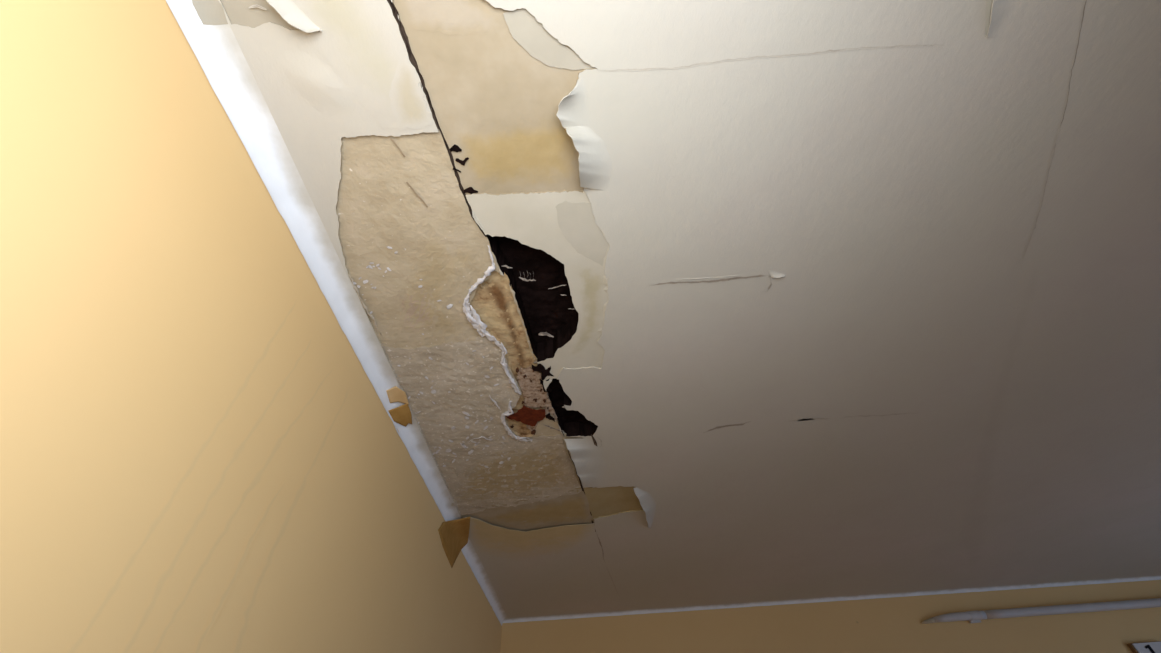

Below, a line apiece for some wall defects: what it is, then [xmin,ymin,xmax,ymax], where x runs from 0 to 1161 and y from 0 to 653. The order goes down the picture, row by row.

peeling [192,0,323,33]
leakage [292,0,581,193]
crack [387,0,487,237]
crack [598,44,943,72]
crack [1022,0,1087,260]
peeling [336,0,657,568]
crack [648,270,786,294]
rust [506,405,546,426]
crack [568,451,621,599]